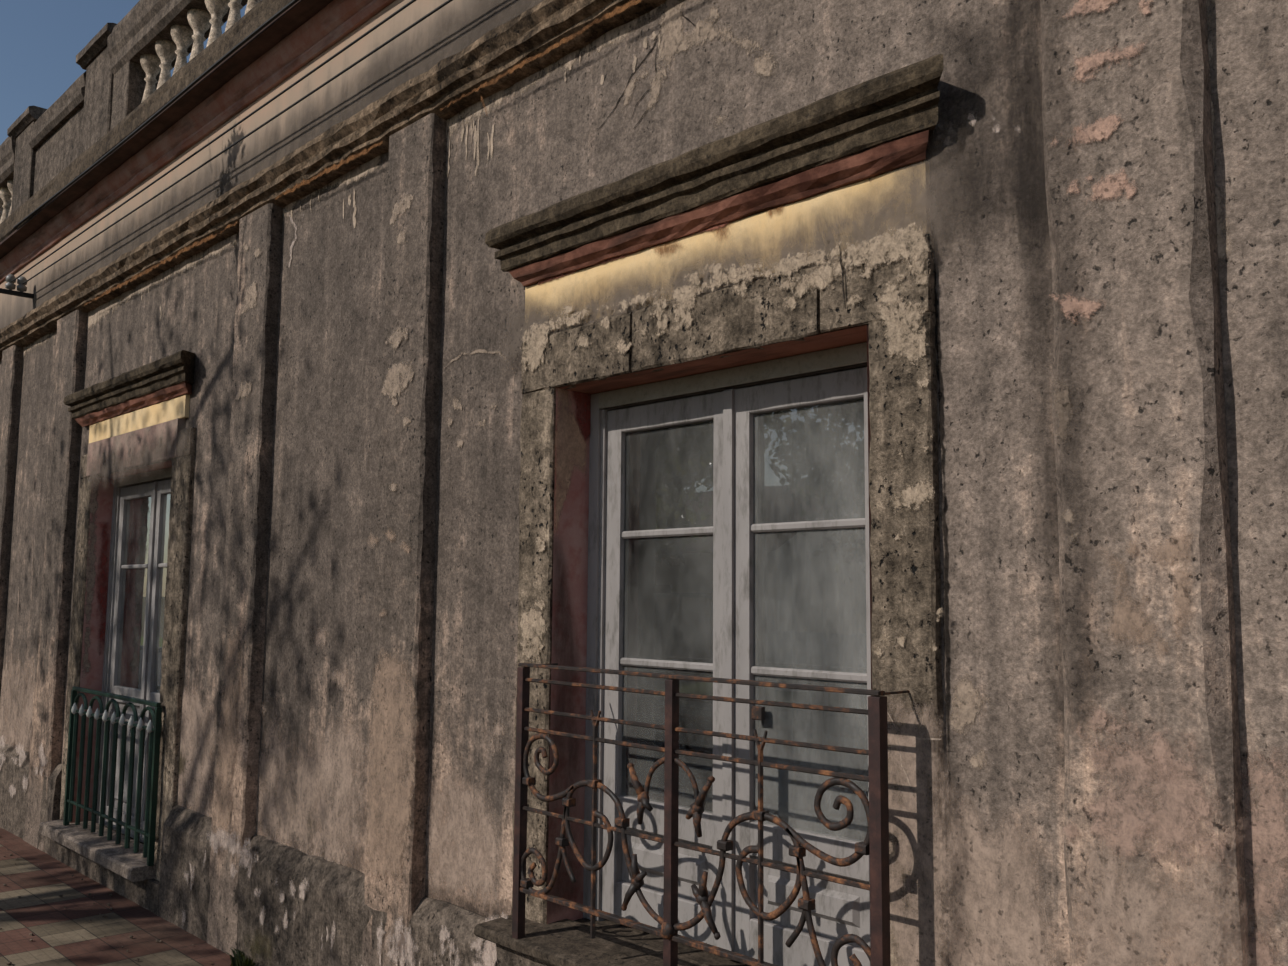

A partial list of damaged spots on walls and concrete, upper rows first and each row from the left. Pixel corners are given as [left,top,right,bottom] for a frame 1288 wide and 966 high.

peeling [1066,0,1117,16]
peeling [1139,0,1152,15]
crack [599,6,718,129]
peeling [1074,43,1144,80]
peeling [1051,114,1120,146]
peeling [1068,170,1136,200]
peeling [689,219,736,235]
peeling [444,222,930,388]
peeling [1052,295,1101,322]
crack [887,230,951,955]